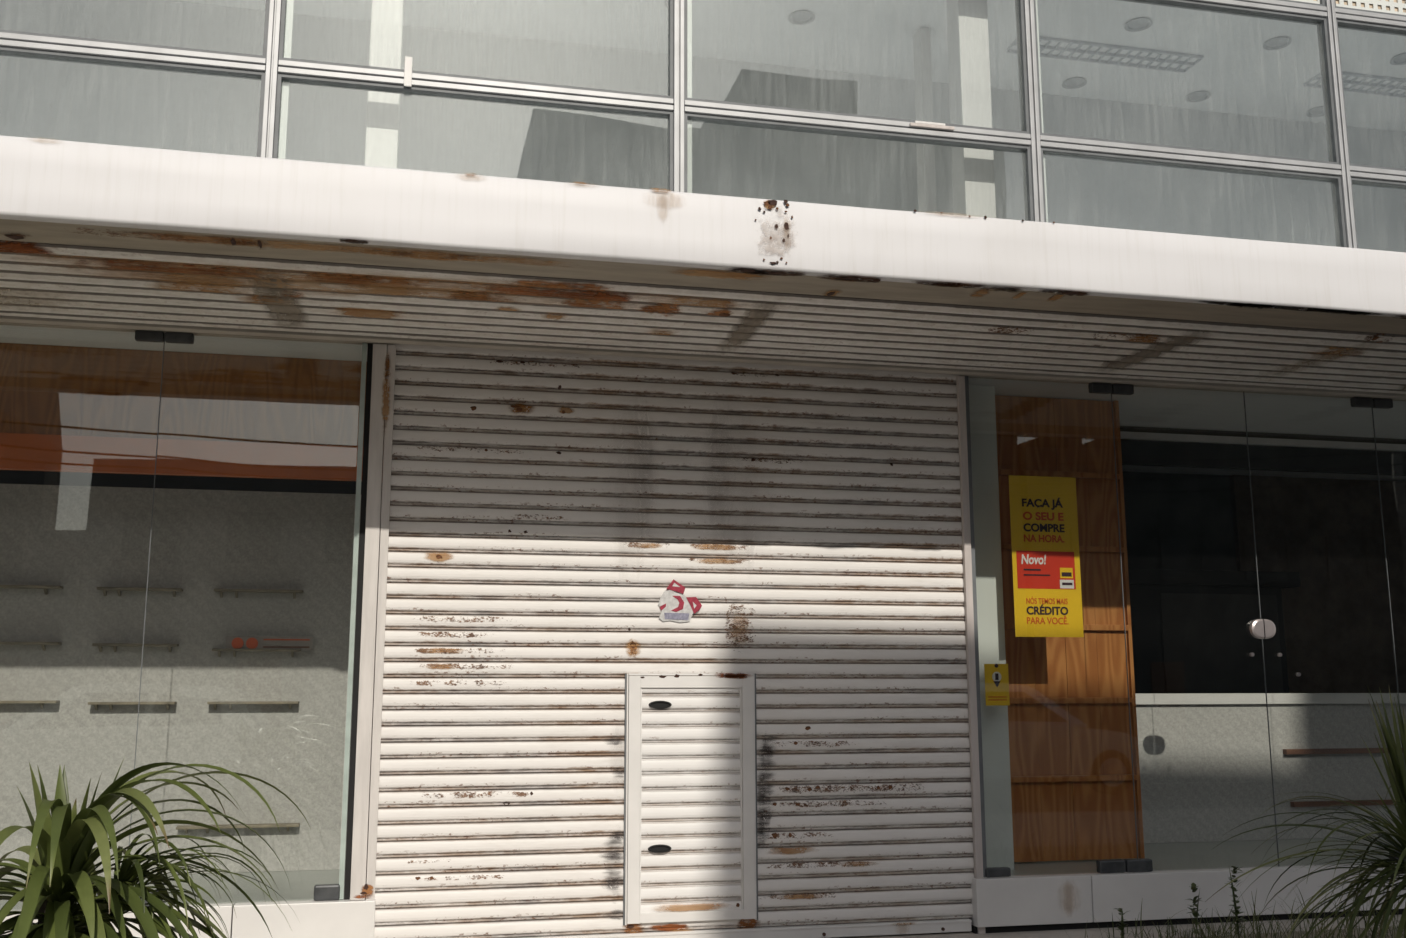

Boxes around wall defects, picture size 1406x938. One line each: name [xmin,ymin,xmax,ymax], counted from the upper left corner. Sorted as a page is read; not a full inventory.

corrosion [0,228,732,335]
corrosion [681,268,881,296]
corrosion [916,282,1089,301]
corrosion [1091,331,1160,347]
corrosion [382,355,390,420]
corrosion [725,604,756,651]
corrosion [414,616,511,686]
corrosion [773,784,924,807]
corrosion [767,832,871,868]
corrosion [625,903,759,933]